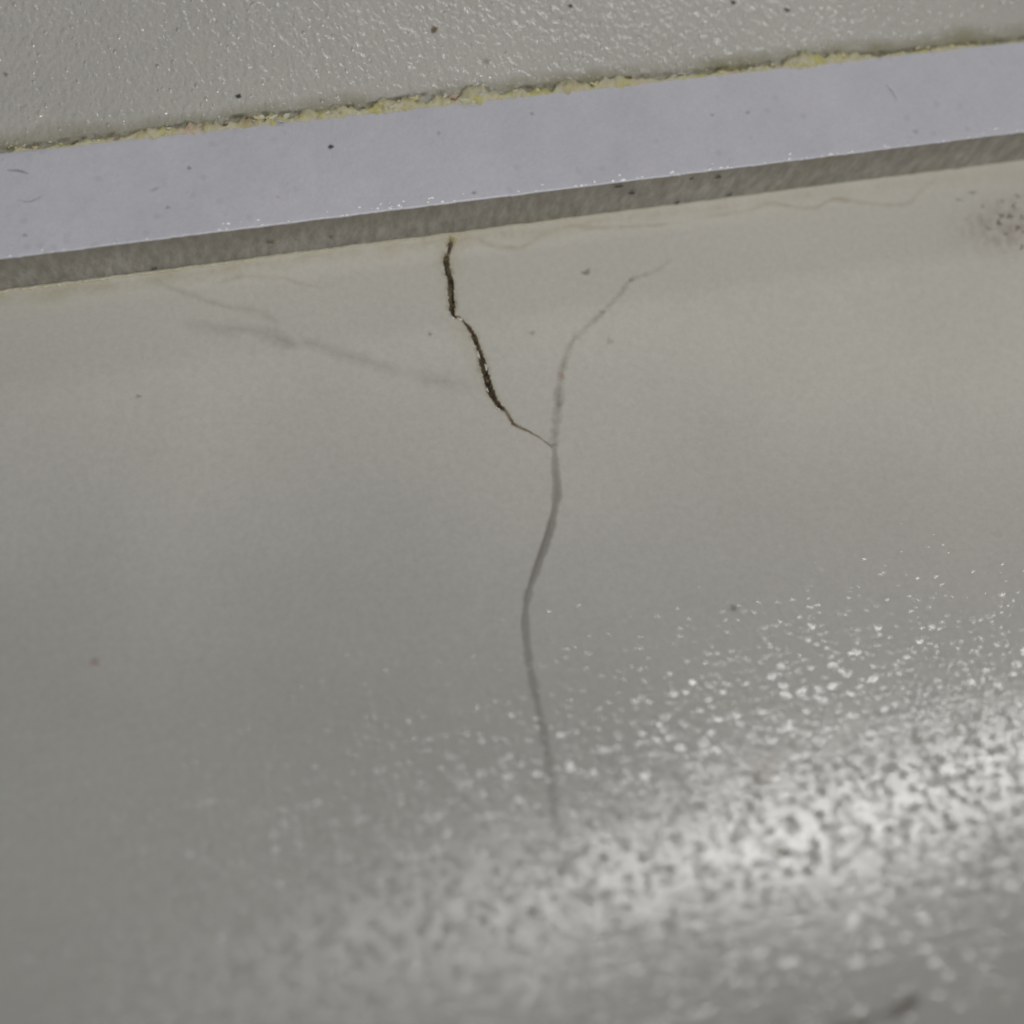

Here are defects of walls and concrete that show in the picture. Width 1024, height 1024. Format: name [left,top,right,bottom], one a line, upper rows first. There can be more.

crack [443,235,534,433]